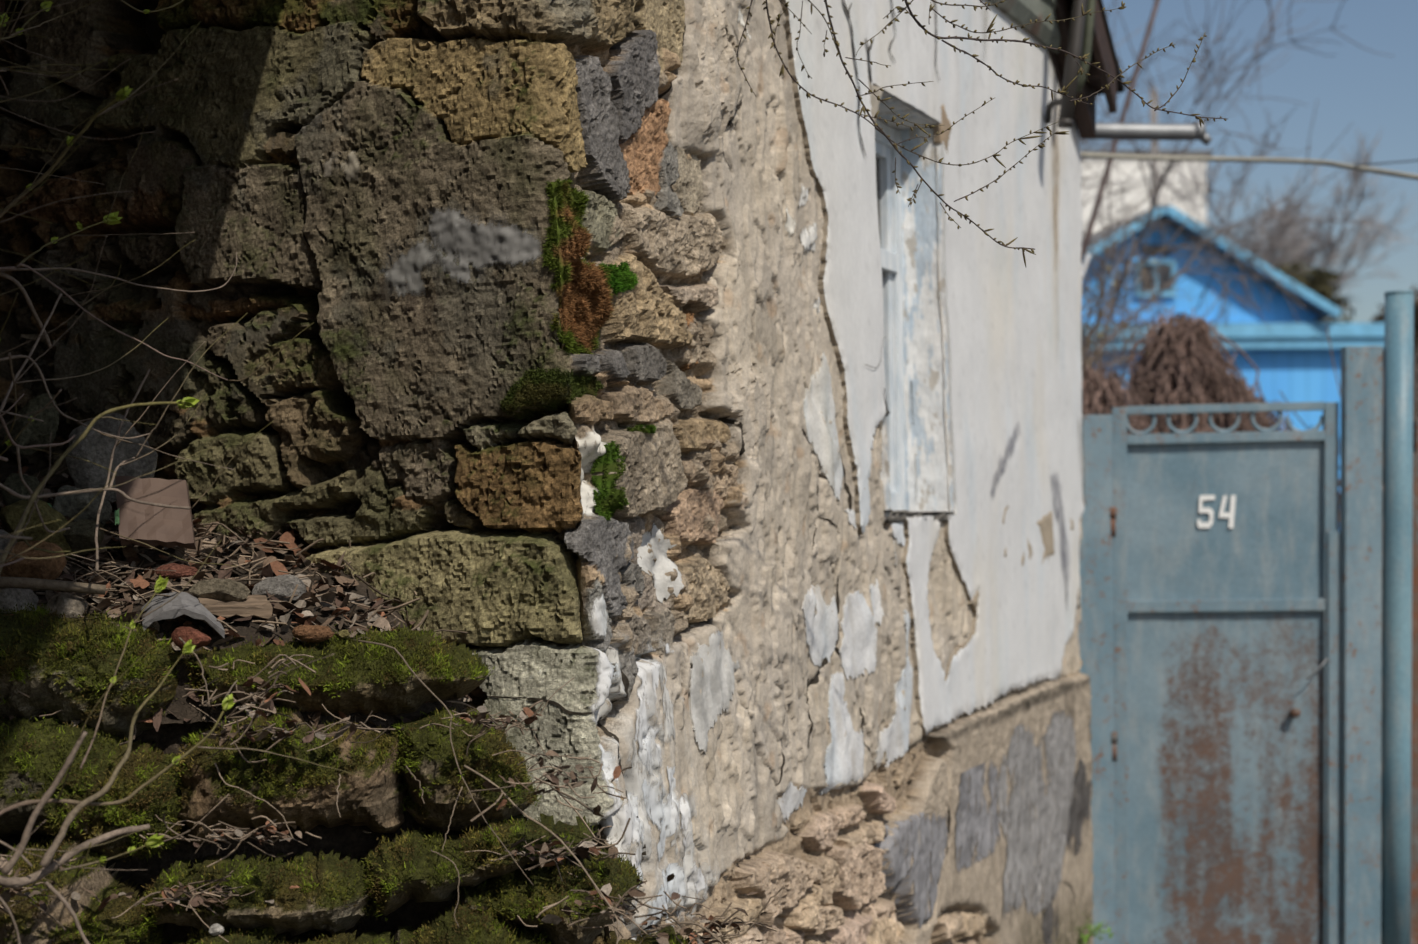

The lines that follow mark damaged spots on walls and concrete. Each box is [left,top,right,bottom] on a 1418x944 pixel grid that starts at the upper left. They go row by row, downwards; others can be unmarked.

spalling [540,0,1093,944]